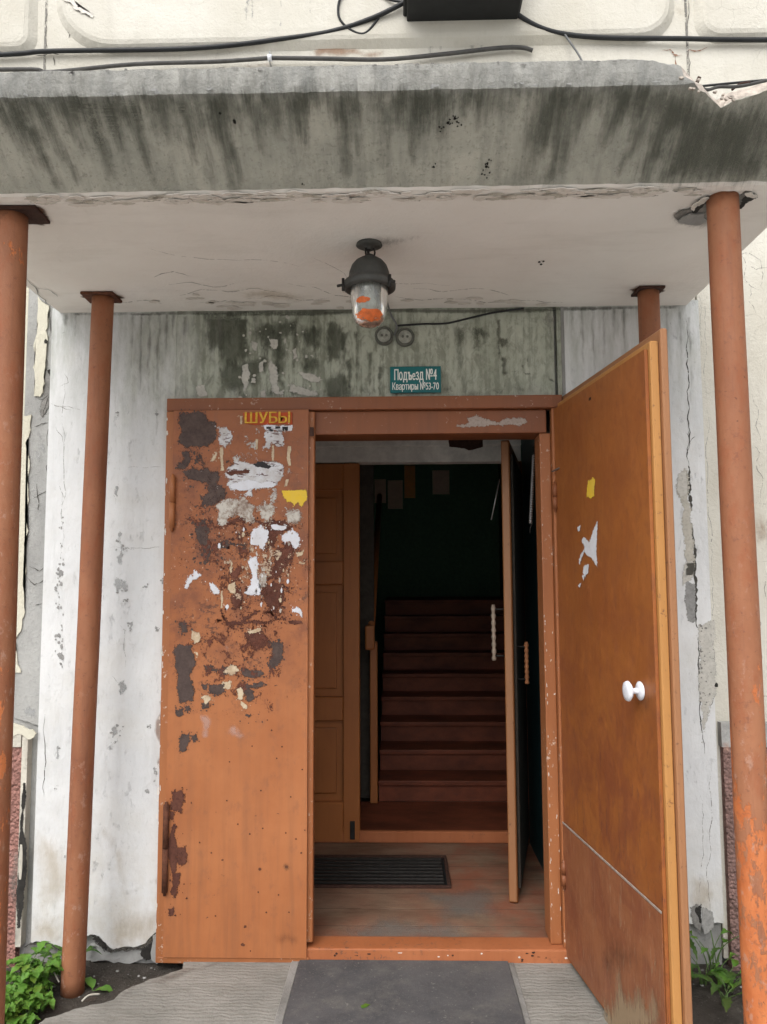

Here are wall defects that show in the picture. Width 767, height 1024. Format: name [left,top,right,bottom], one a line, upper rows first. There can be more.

spalling [679,76,767,102]
water stain [610,92,757,175]
peeling [26,186,710,226]
spalling [739,191,758,209]
peeling [155,271,323,398]
water stain [179,309,382,397]
water stain [387,307,621,374]
peeling [448,414,527,450]
peeling [15,297,50,673]
peeling [155,409,311,724]
crack [676,305,715,901]
flaking render [86,764,192,964]